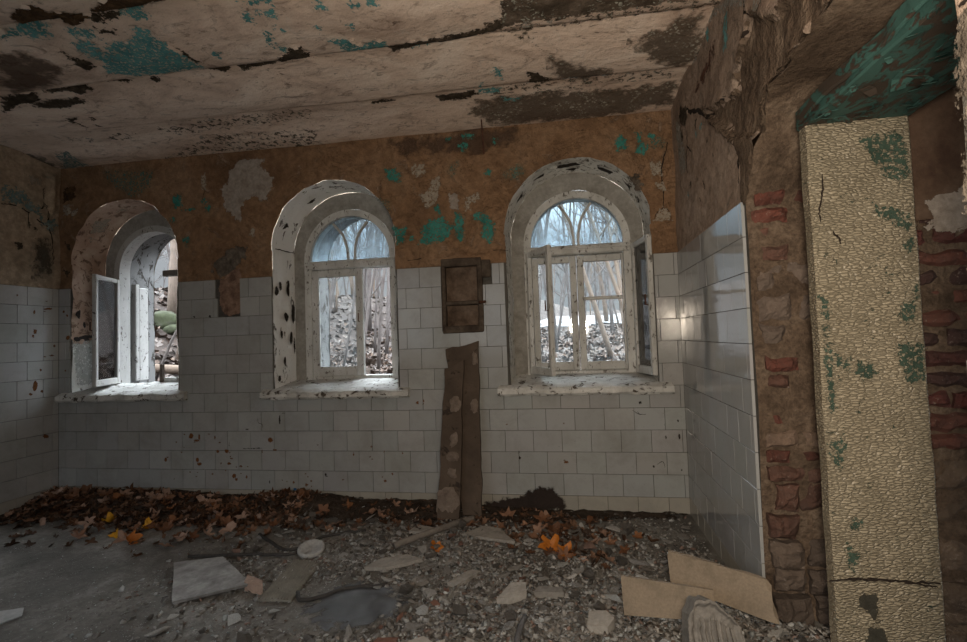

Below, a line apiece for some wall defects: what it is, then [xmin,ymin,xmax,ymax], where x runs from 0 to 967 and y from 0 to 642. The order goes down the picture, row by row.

damp [0,52,63,93]
spalling [0,84,102,143]
peeling [0,0,314,84]
spalling [159,109,317,223]
peeling [384,133,496,246]
damp [388,55,679,156]
spalling [313,0,831,205]
damp [482,0,688,30]
damp [626,14,704,67]
spalling [808,7,967,252]
peeling [856,594,888,642]
crack [829,577,941,588]